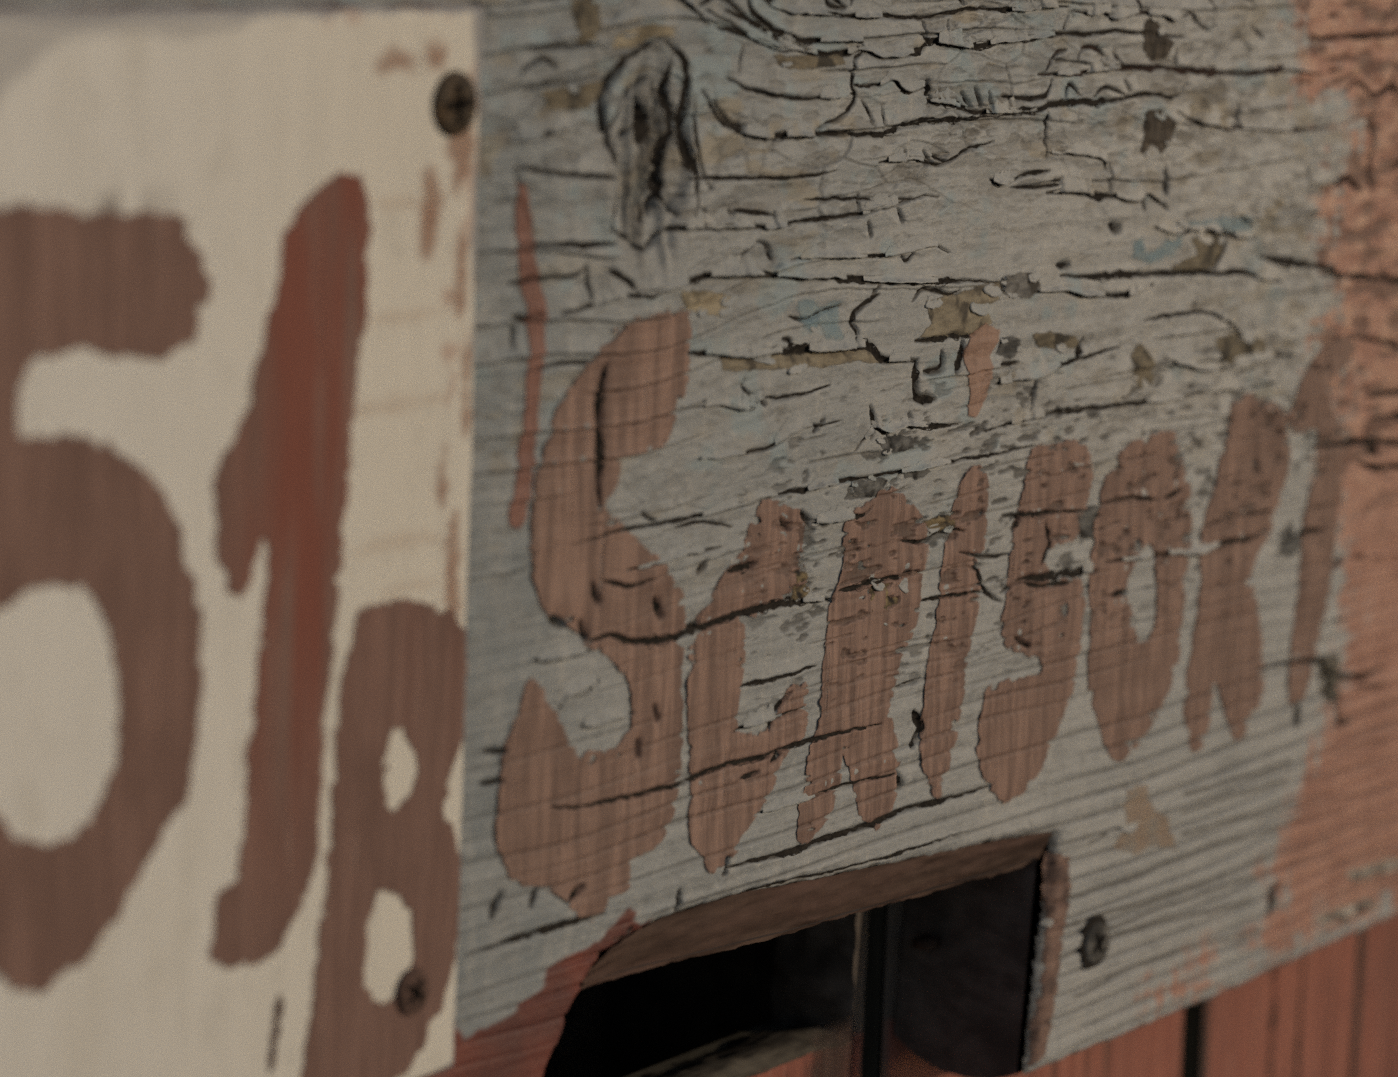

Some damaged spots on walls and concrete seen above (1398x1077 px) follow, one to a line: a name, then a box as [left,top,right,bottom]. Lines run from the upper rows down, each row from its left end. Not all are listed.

peeling [571,0,602,44]
peeling [1140,15,1174,61]
peeling [1141,109,1177,155]
peeling [1133,216,1255,271]
peeling [719,300,879,375]
crack [508,0,1398,649]
peeling [921,269,1078,359]
peeling [1131,344,1156,390]
peeling [1216,328,1267,365]
peeling [876,434,918,455]
crack [1257,658,1384,725]
peeling [1027,852,1072,1066]